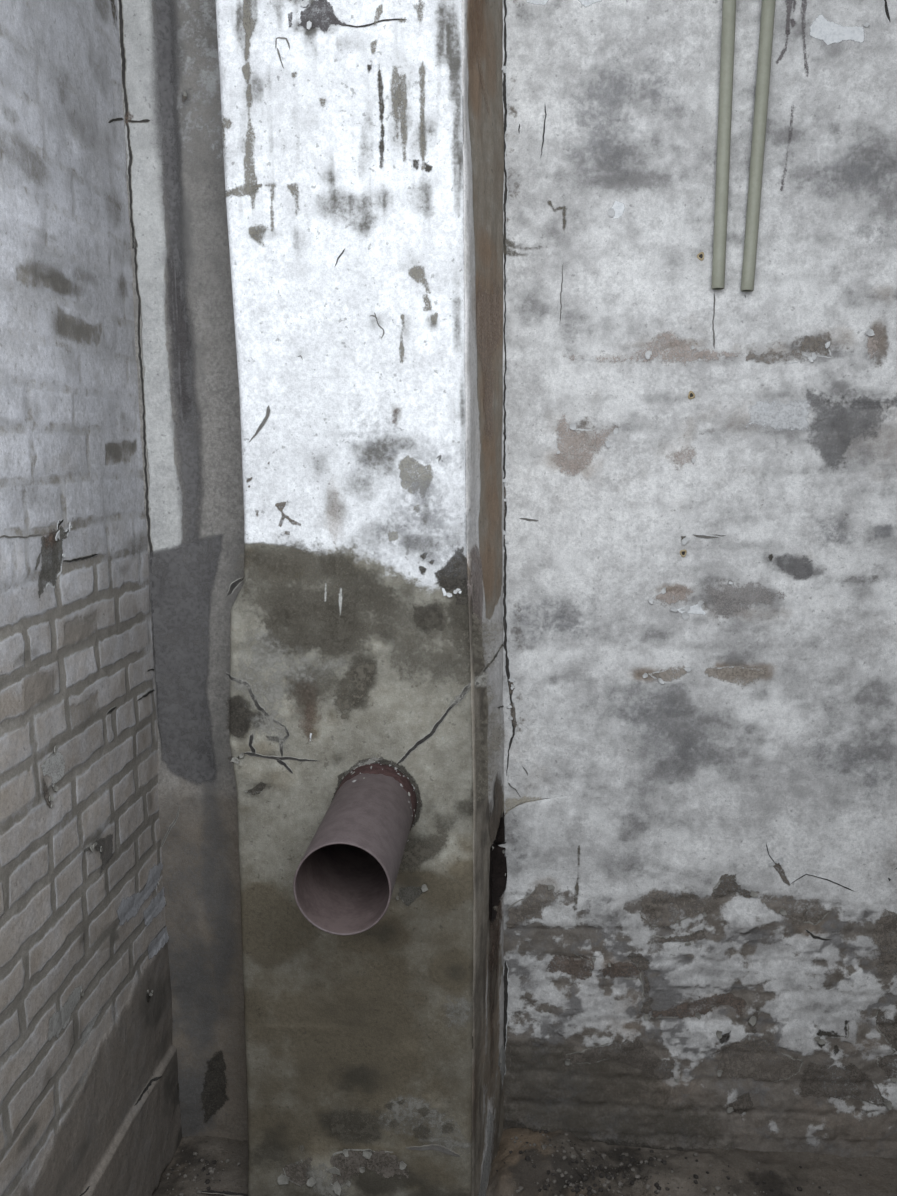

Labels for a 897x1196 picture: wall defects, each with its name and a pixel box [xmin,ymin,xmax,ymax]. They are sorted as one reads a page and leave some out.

flaking render [288,0,407,32]
damp [225,0,299,246]
damp [367,41,433,172]
crack [108,0,153,565]
damp [148,0,222,784]
crack [398,0,547,797]
rust [476,285,501,434]
crack [225,673,318,773]
damp [226,542,539,844]
flaking render [489,812,556,929]
peeling [639,844,854,945]
peeling [546,952,897,1114]